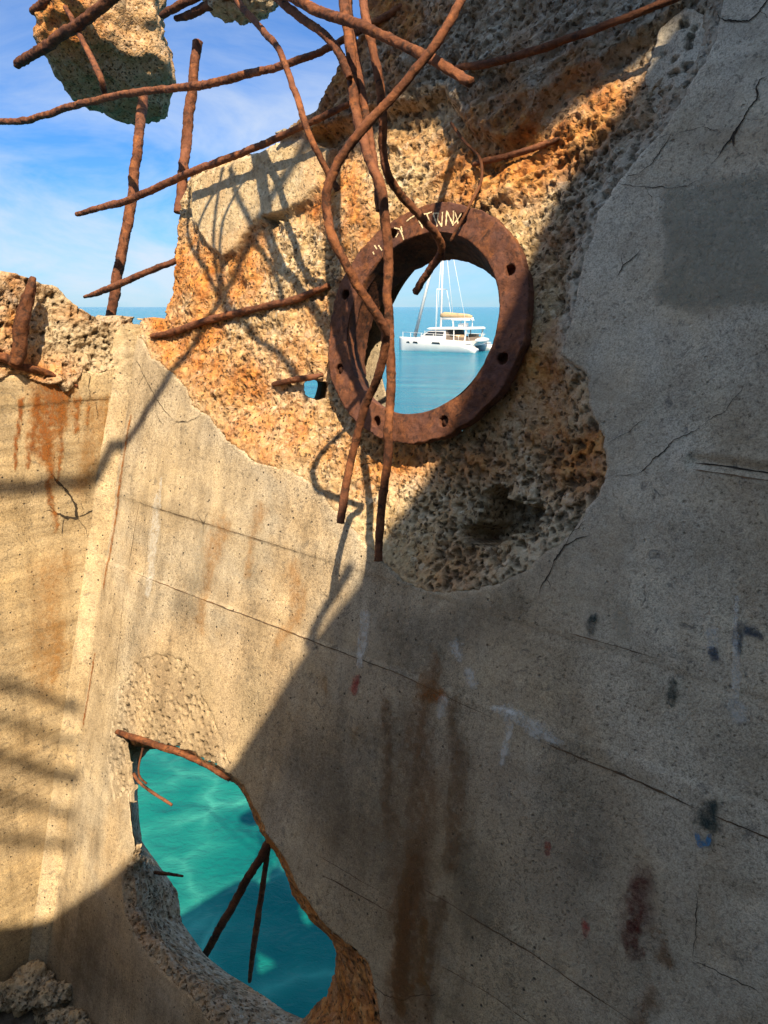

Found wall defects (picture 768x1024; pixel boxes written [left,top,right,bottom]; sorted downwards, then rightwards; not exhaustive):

crack [619,76,767,197]
spalling [0,0,724,593]
rust [13,383,90,528]
crack [44,474,93,537]
crack [616,381,750,476]
spalling [124,843,234,1024]
spalling [203,839,271,983]